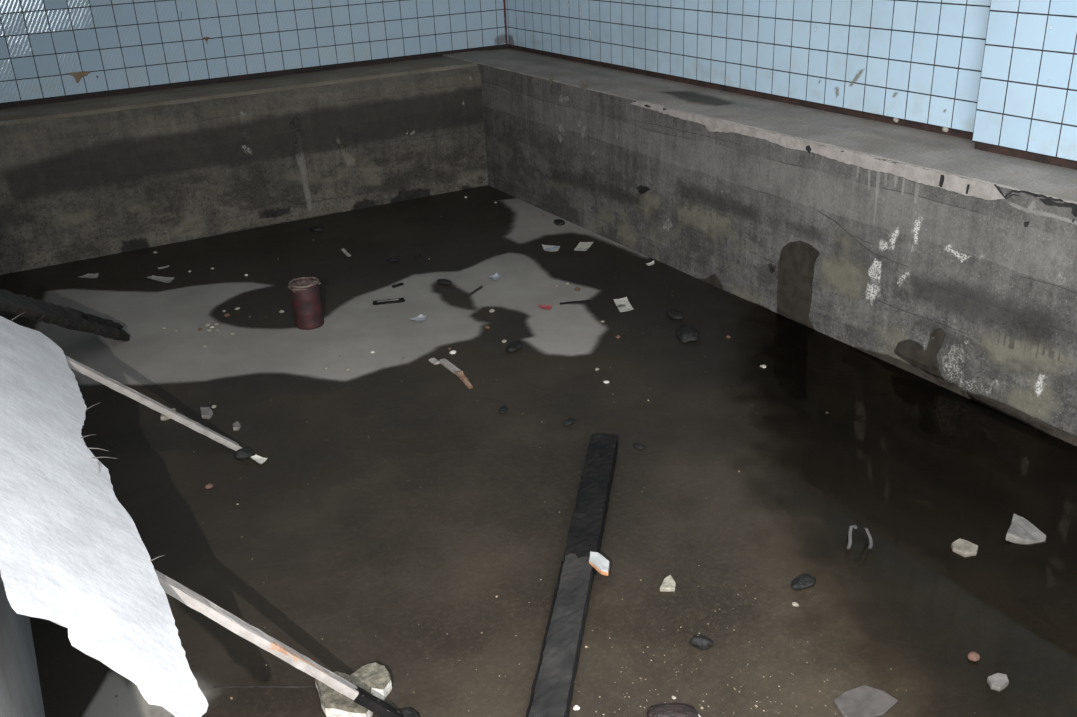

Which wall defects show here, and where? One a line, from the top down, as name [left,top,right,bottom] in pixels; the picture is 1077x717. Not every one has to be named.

rust [69,71,99,83]
spalling [0,49,1077,436]
crack [994,184,1063,202]
water stain [0,185,1077,717]